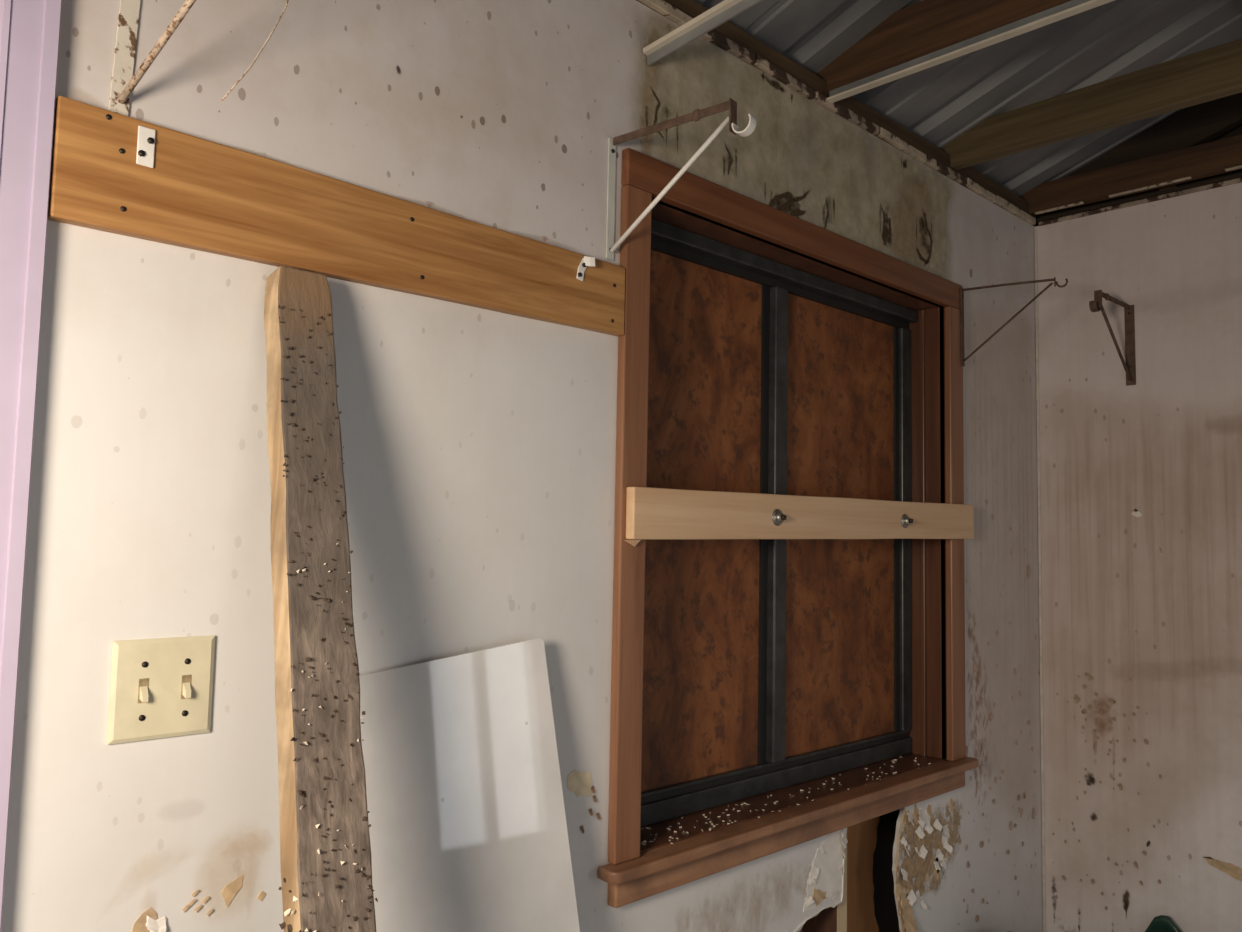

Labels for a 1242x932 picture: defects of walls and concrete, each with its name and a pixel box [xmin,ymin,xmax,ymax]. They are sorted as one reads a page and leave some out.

damp [638,20,950,279]
peeling [132,907,167,932]
peeling [182,875,243,916]
peeling [785,829,848,932]
peeling [895,770,1004,932]